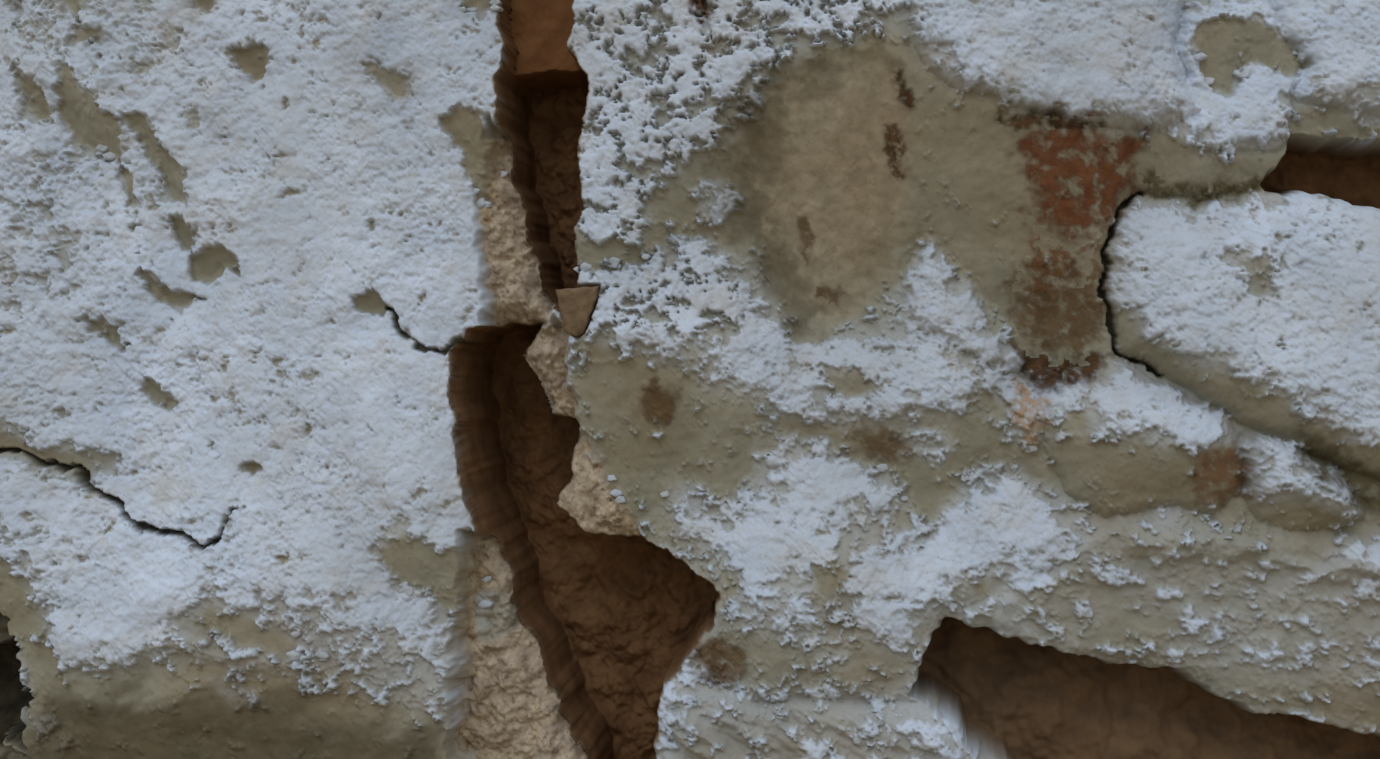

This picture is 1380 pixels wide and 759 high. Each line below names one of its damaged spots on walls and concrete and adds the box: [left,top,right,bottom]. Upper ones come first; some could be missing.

peeling [458,0,512,16]
damp [896,69,914,108]
peeling [449,124,509,214]
damp [884,124,904,179]
peeling [573,225,674,274]
damp [798,217,813,260]
corrosion [997,102,1148,445]
crack [387,0,719,759]
crack [0,448,239,553]
peeling [20,706,29,726]